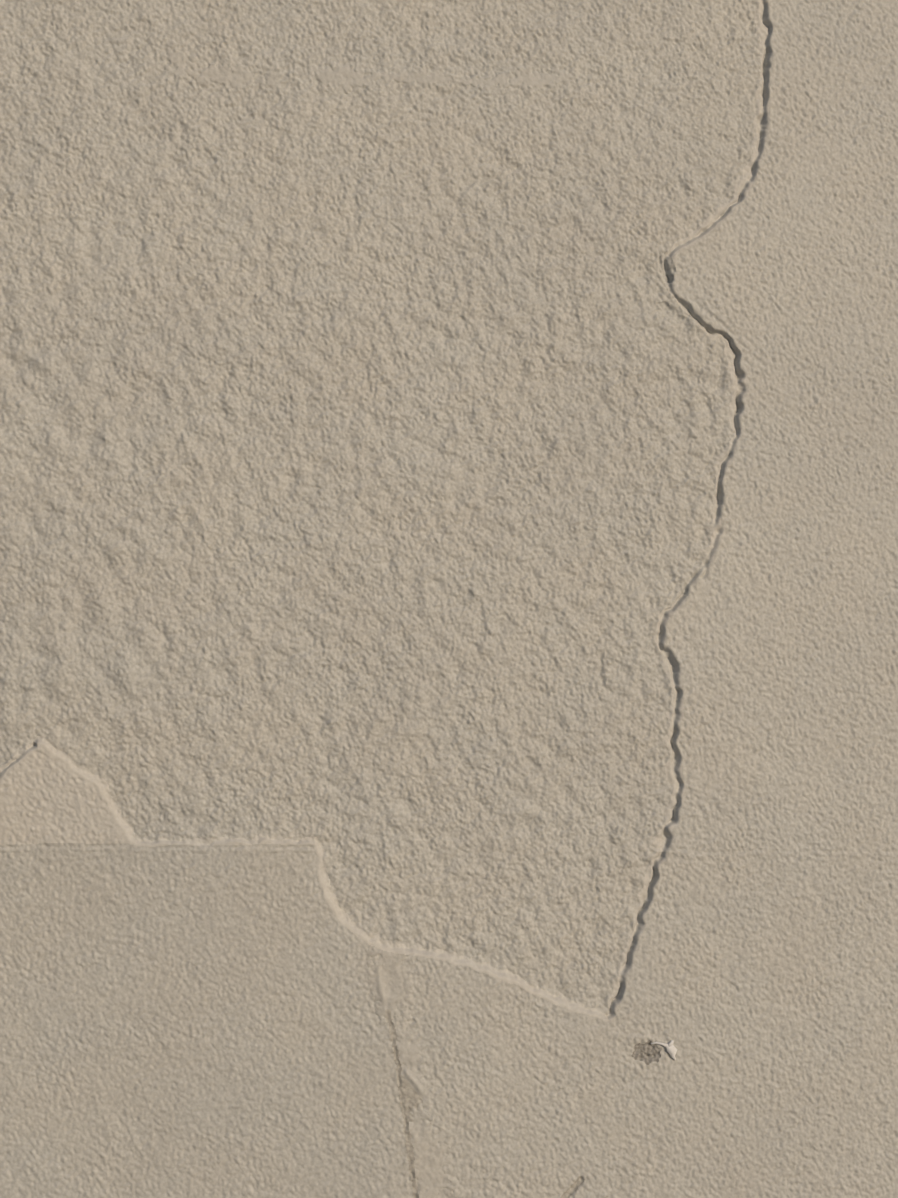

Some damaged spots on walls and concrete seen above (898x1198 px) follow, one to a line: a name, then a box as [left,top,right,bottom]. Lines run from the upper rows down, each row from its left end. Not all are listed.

spalling [658,252,676,284]